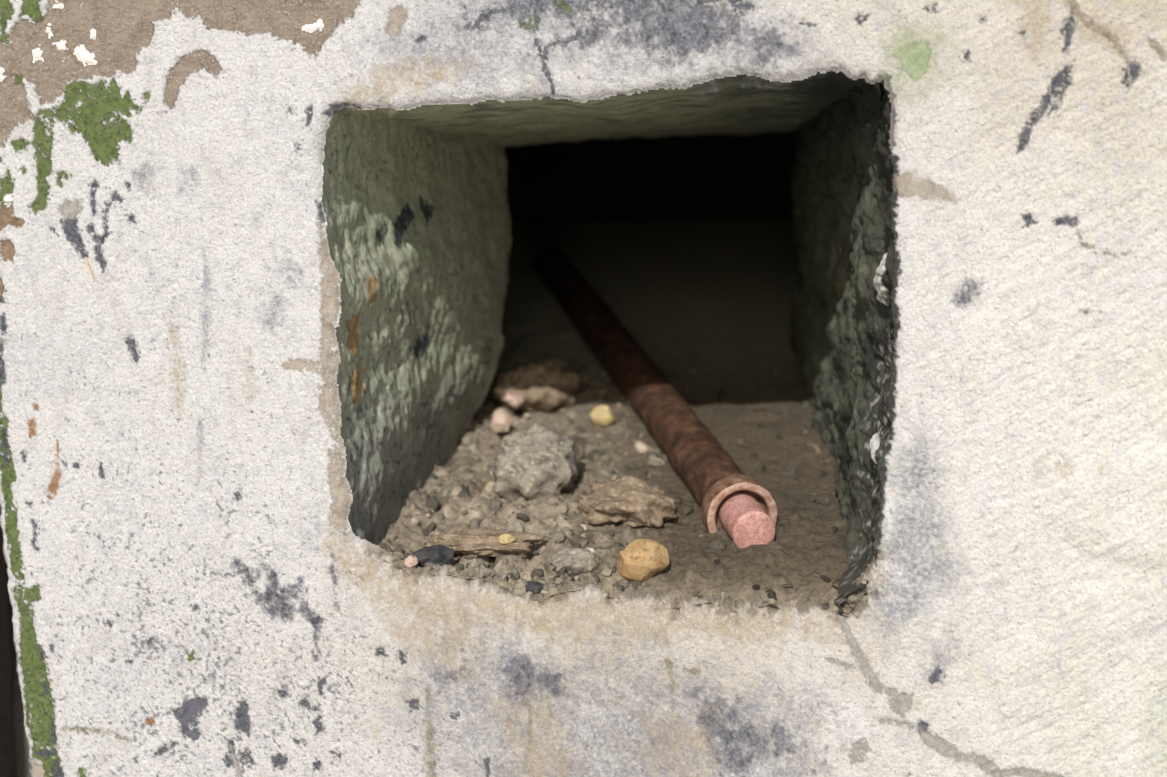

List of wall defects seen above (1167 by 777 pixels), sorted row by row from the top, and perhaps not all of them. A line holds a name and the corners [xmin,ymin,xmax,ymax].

flaking render [385,6,408,38]
water stain [453,0,796,63]
flaking render [0,0,361,273]
flaking render [376,195,434,249]
peeling [125,337,140,363]
flaking render [282,201,378,535]
peeling [0,278,86,777]
peeling [155,697,209,755]
peeling [222,701,254,767]
peeling [271,753,288,771]
peeling [277,678,326,746]
crack [827,612,1063,777]